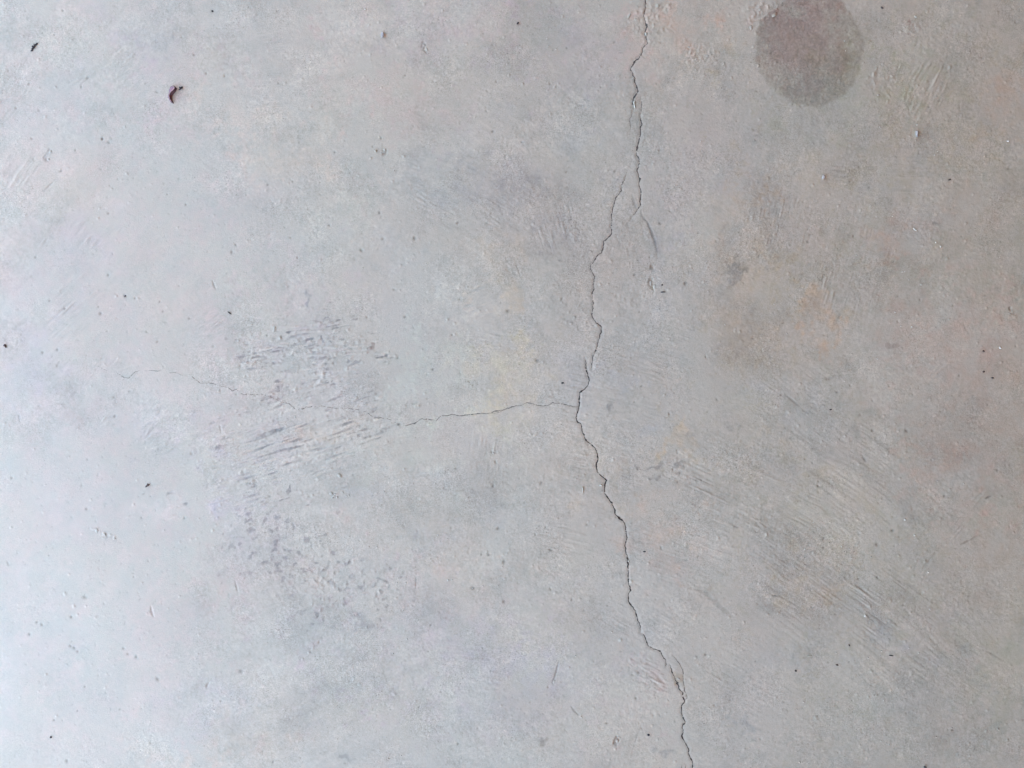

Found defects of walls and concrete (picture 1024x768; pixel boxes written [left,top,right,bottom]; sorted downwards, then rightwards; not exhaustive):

crack [104,0,695,768]
leakage [746,0,867,109]